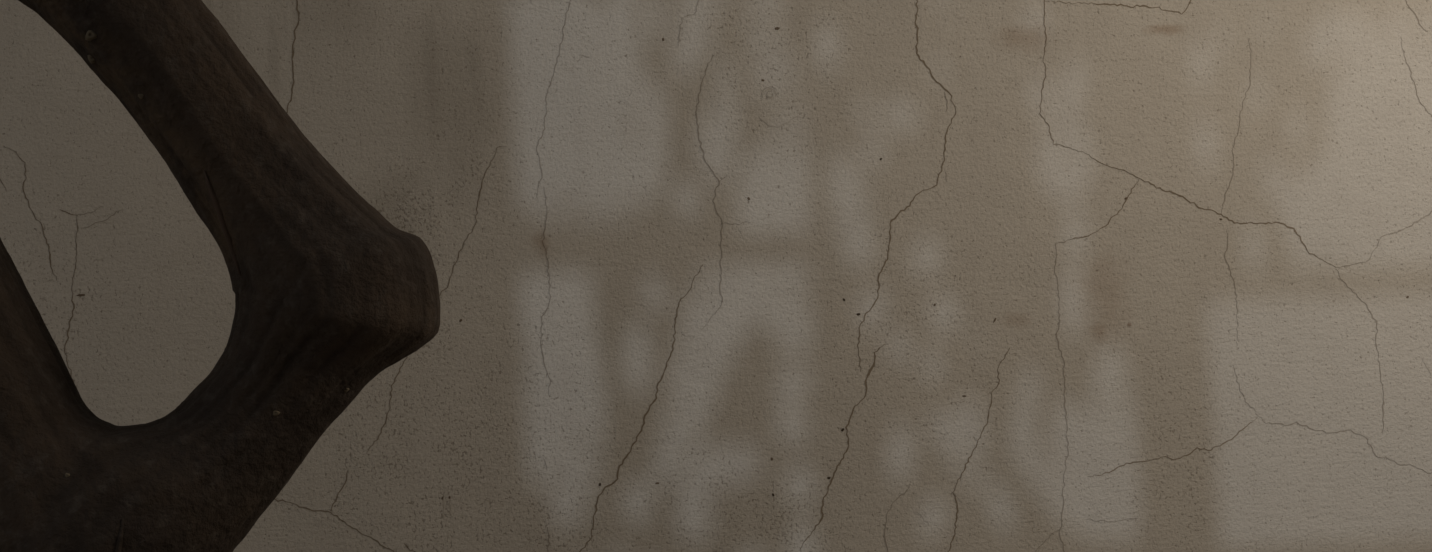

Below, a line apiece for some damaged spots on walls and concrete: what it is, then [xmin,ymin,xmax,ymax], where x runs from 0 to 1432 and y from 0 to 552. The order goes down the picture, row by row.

crack [287,0,302,113]
crack [275,357,415,552]
crack [439,0,571,395]
crack [547,0,747,552]
crack [800,0,956,551]
crack [1037,0,1432,551]